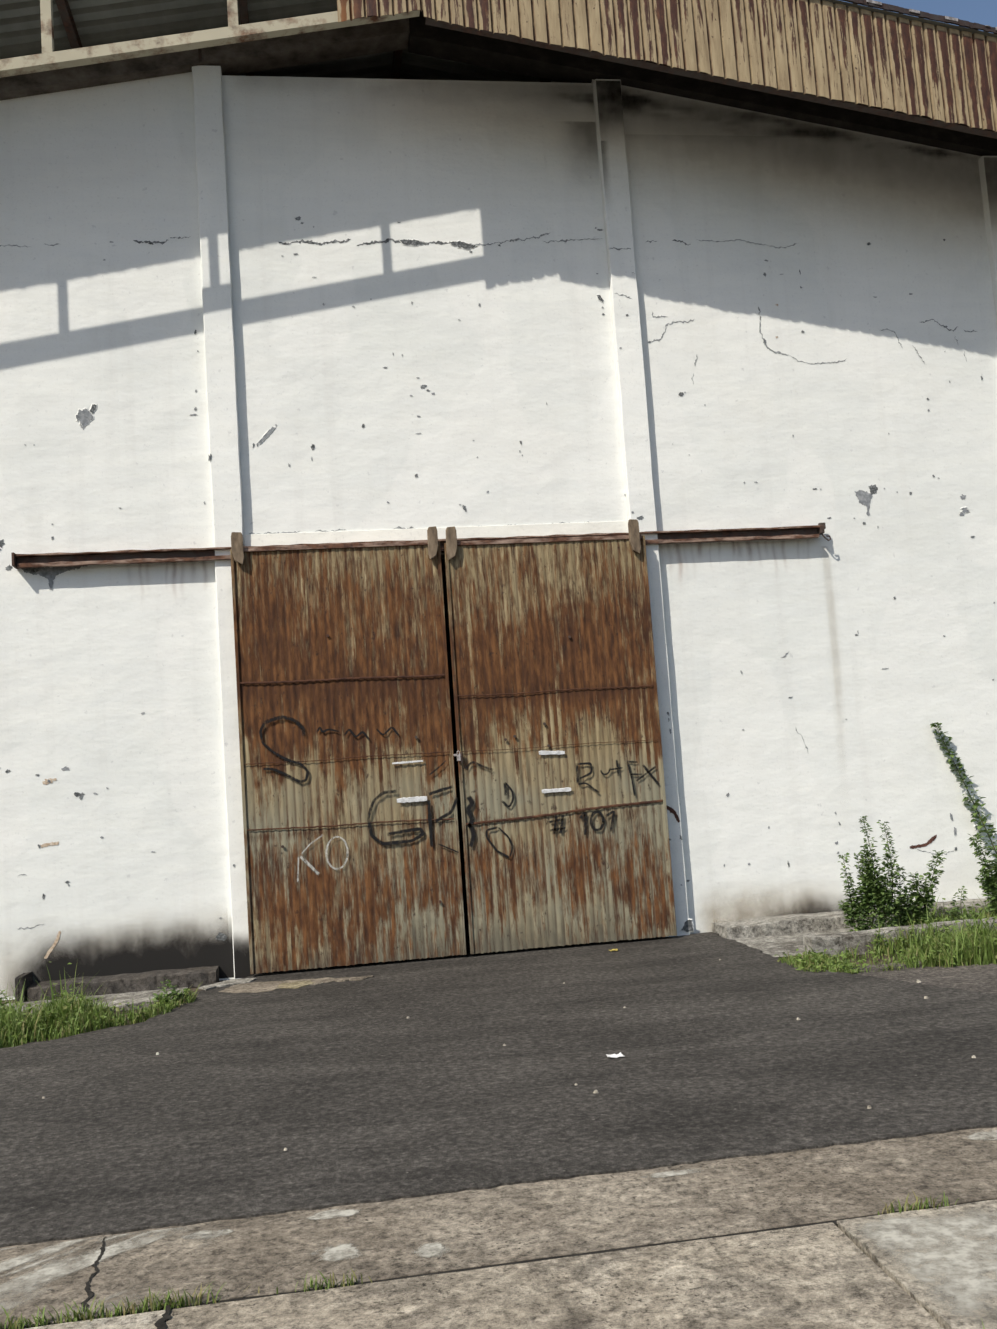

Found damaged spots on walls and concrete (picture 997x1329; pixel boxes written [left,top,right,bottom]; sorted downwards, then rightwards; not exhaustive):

crack [103,237,189,261]
crack [279,232,797,343]
crack [758,307,845,364]
crack [881,319,978,364]
peeling [75,403,98,429]
peeling [854,485,912,528]